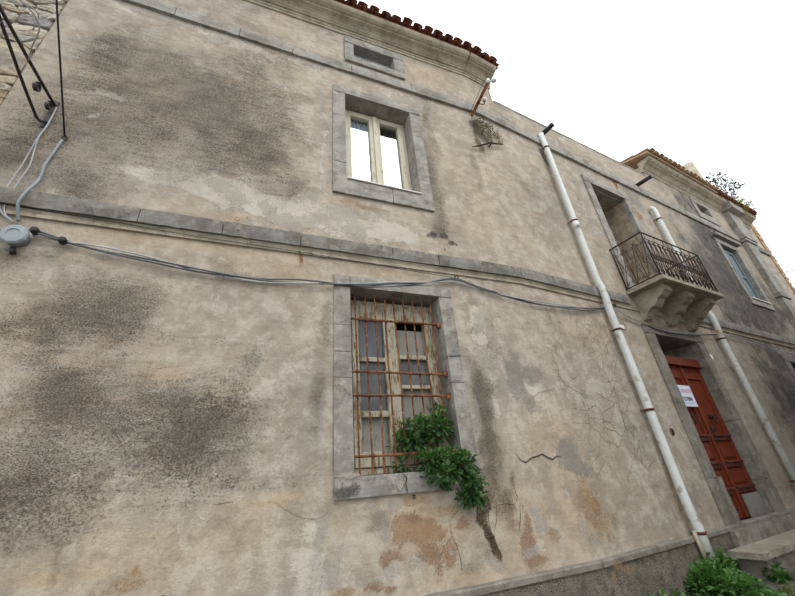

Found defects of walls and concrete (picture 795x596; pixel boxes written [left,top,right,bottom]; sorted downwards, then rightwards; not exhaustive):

flaking render [363,481,468,594]
damp [473,374,502,561]
crack [533,312,655,484]